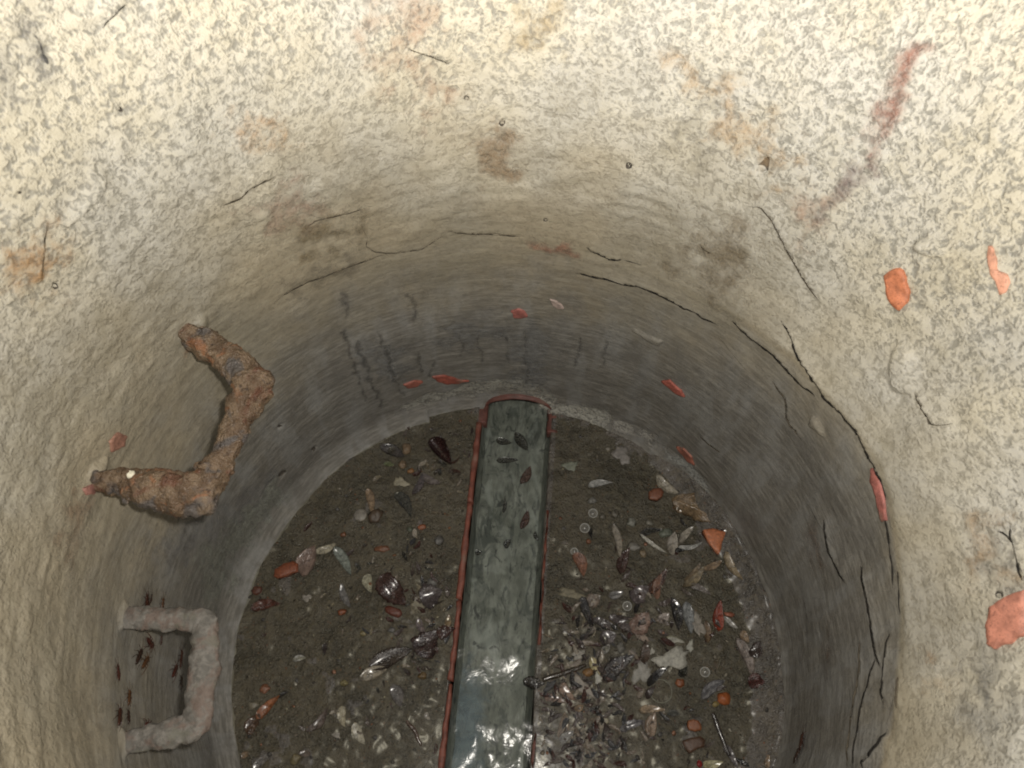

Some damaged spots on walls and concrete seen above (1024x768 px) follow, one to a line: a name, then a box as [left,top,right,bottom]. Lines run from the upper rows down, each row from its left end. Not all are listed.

corrosion [90,468,133,495]
crack [275,206,900,767]
crack [998,530,1022,580]